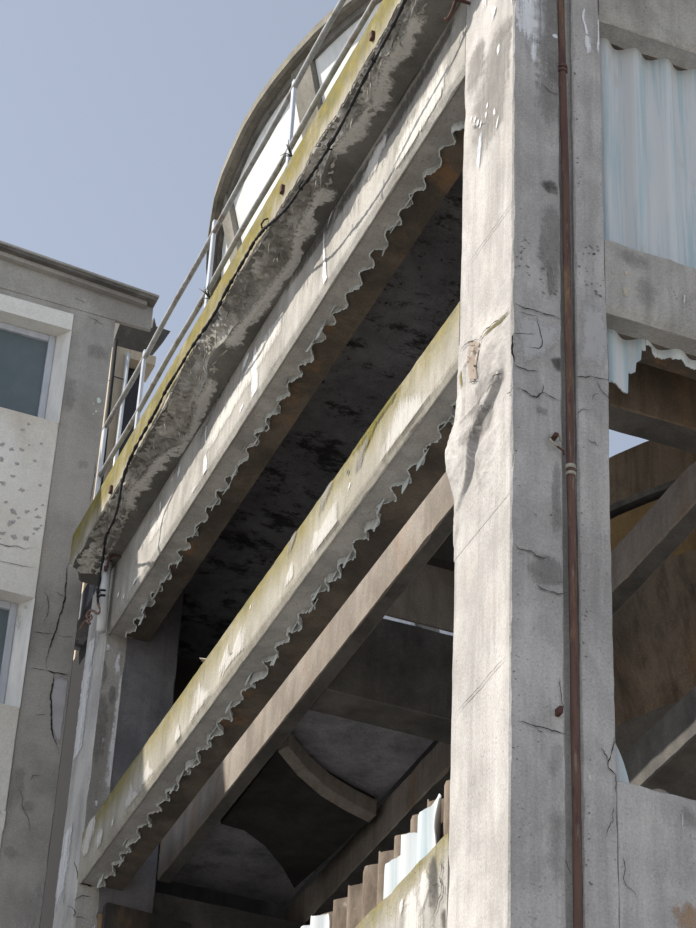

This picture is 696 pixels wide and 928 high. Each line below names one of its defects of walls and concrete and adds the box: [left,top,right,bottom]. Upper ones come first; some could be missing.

spalling [75,0,427,575]
water stain [124,15,452,510]
spalling [467,341,479,380]
crack [460,304,609,413]
water stain [0,501,44,540]
efflorescence [147,501,167,541]
crack [33,565,69,748]
crack [602,737,616,836]